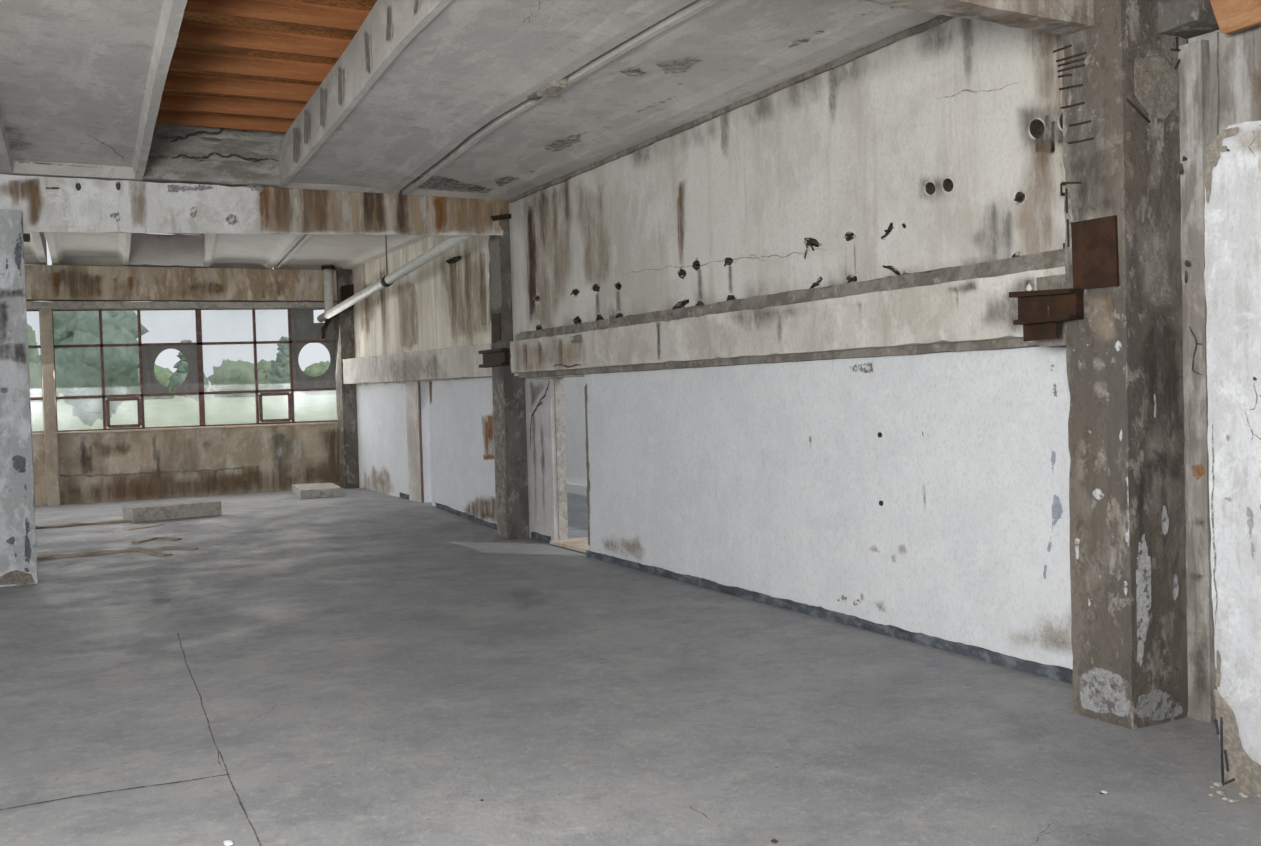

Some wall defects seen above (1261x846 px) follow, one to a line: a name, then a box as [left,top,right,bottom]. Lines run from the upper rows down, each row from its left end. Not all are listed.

crack [170,128,278,162]
spalling [1204,127,1239,203]
water stain [5,181,41,223]
water stain [261,176,518,234]
water stain [529,181,607,323]
water stain [69,430,339,500]
peeling [1161,506,1169,535]
spalling [1079,667,1183,721]
spalling [1213,650,1261,796]